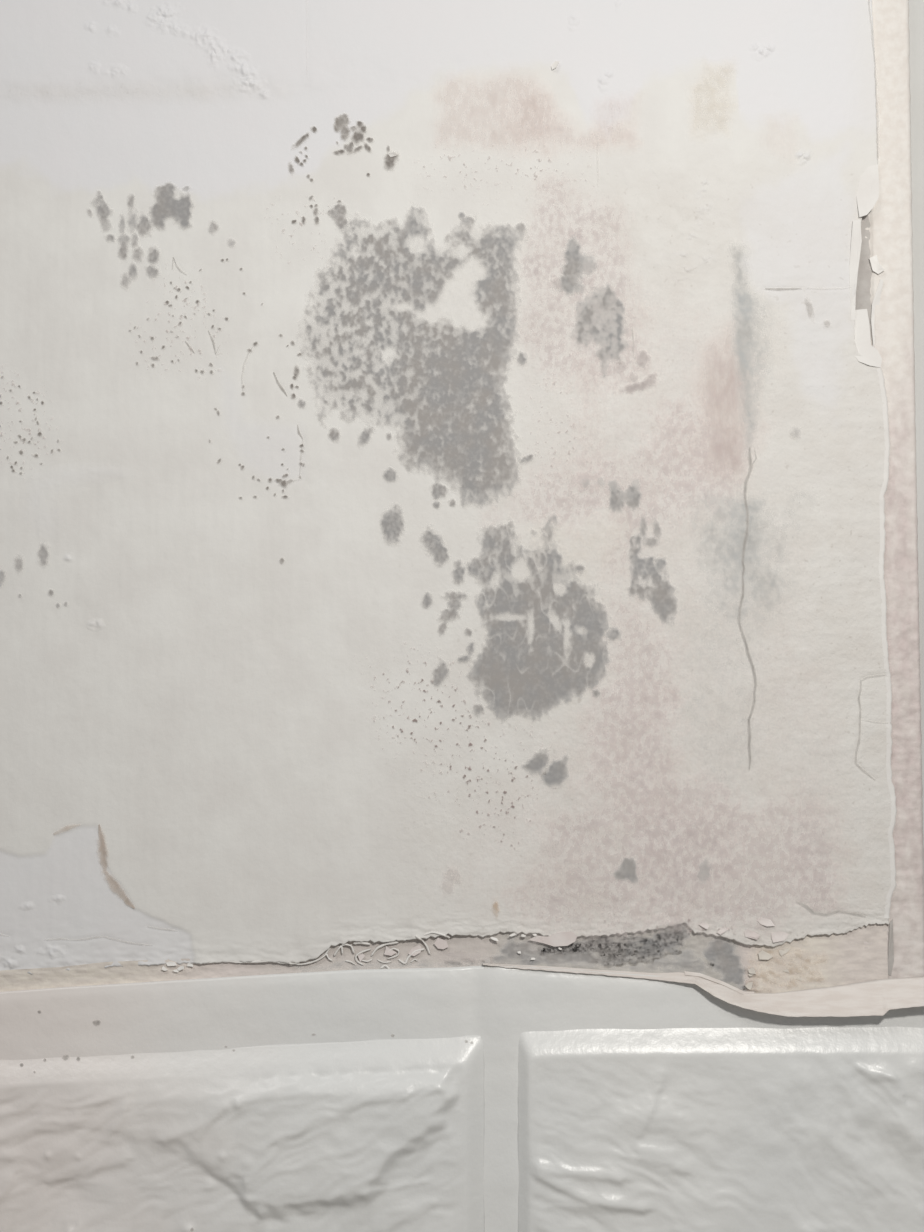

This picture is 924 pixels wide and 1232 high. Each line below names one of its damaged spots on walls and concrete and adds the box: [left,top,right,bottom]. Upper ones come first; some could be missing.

damp [334,114,373,154]
damp [88,183,228,374]
damp [279,126,656,508]
damp [0,376,61,474]
damp [239,444,305,499]
flaking render [0,164,924,1017]
damp [370,498,661,846]
damp [609,481,677,622]
crack [738,448,757,770]